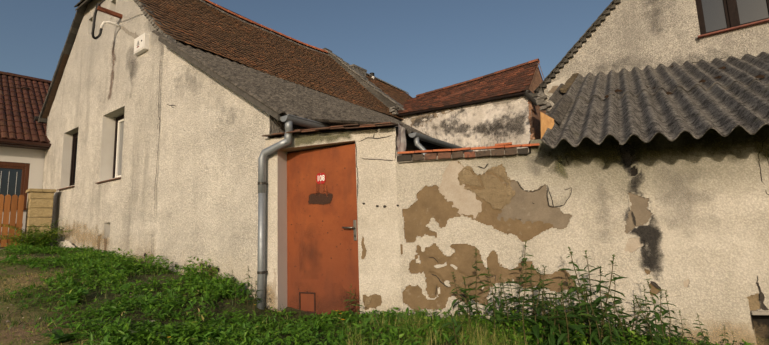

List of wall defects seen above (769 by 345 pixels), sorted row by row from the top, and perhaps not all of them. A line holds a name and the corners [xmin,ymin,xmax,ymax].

damp [413,115,525,137]
spalling [363,294,382,310]
spalling [376,159,576,312]
damp [618,144,663,296]